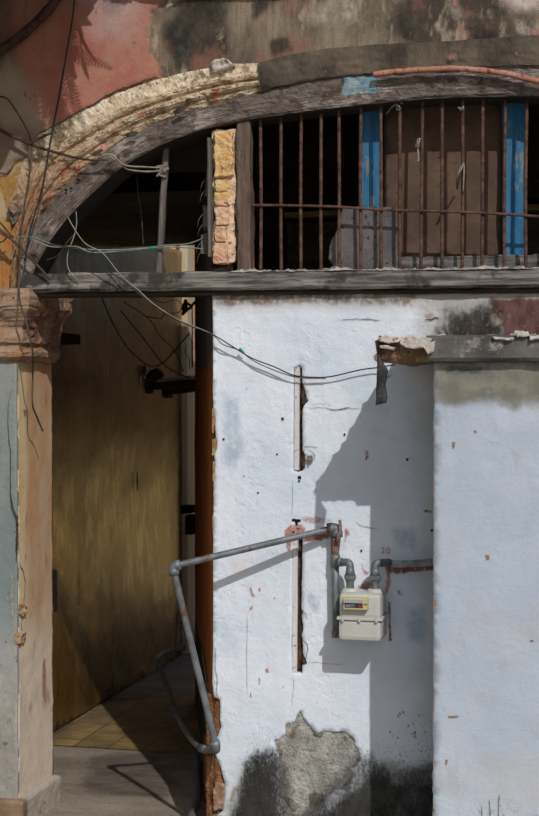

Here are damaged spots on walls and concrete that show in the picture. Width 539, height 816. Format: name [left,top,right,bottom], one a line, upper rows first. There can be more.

leakage [254,0,274,16]
leakage [312,0,358,25]
leakage [503,0,539,10]
leakage [271,38,289,53]
flaking render [33,77,154,140]
peeling [374,334,446,361]
peeling [493,331,539,341]
corrosion [386,566,433,574]
spalling [201,651,225,816]
leakage [231,734,289,816]
spalling [274,711,359,816]
leakage [303,742,434,816]